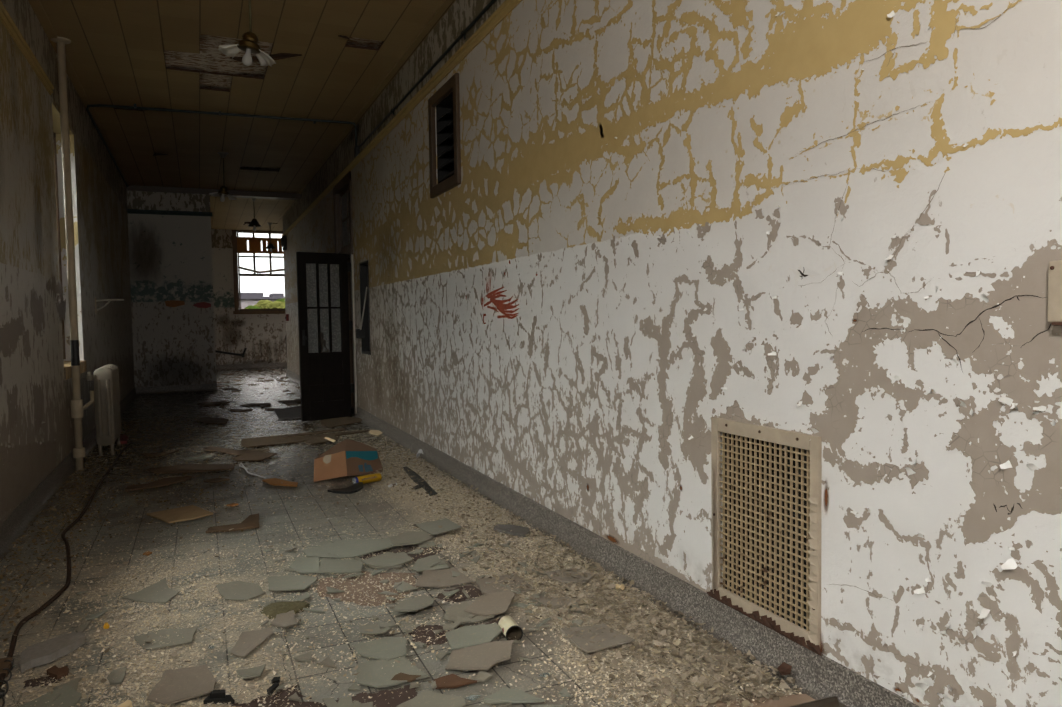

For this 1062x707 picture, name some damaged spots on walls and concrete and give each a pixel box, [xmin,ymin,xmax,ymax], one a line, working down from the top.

crack [782,167,947,334]
peeling [0,276,66,436]
peeling [303,0,1062,707]
crack [862,295,1046,372]
peeling [231,681,432,707]